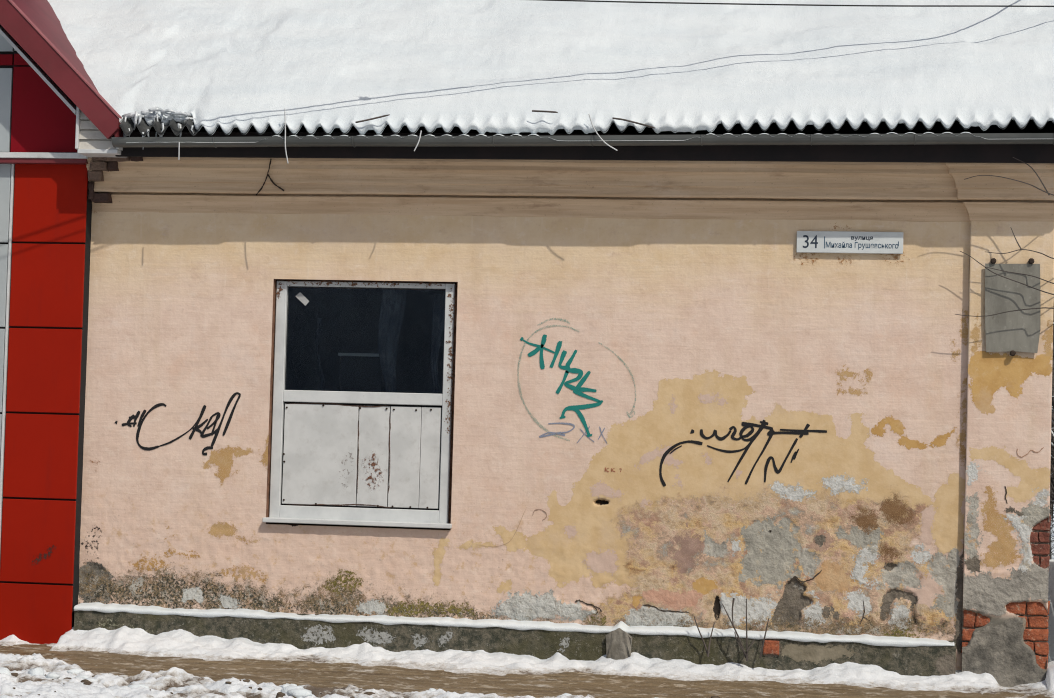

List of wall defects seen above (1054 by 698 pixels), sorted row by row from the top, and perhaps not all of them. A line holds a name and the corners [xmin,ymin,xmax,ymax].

peeling [835,364,873,396]
peeling [949,309,1053,415]
peeling [203,446,259,487]
rust [288,402,391,508]
peeling [207,521,258,545]
peeling [432,369,1051,687]
water stain [78,553,956,640]